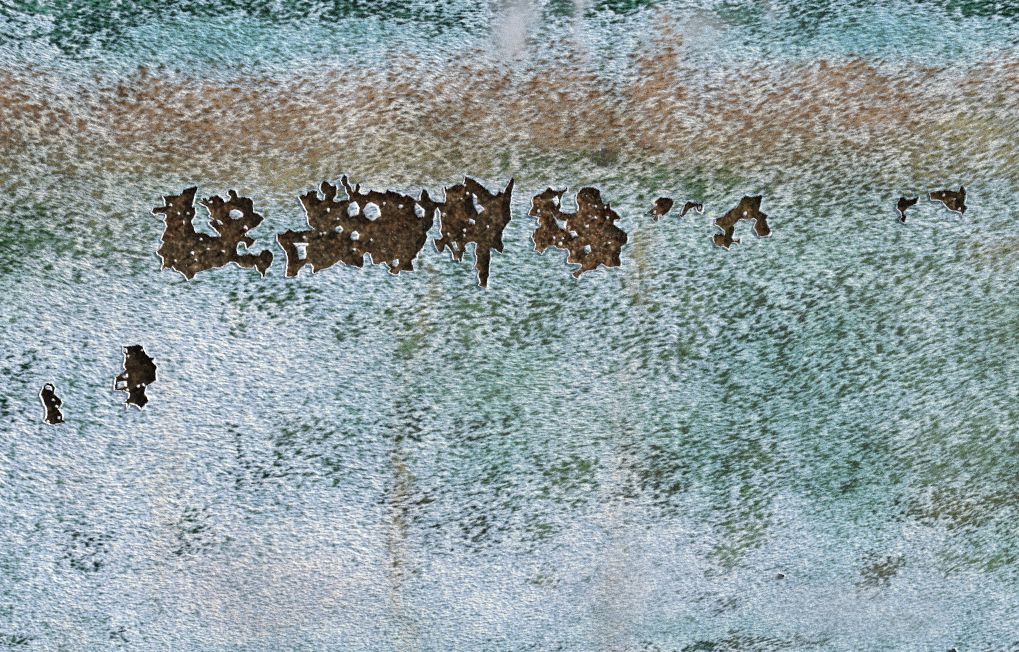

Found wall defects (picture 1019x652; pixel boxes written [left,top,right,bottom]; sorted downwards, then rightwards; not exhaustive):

rust [0,7,1019,200]
peeling [150,174,515,288]
peeling [528,186,628,280]
peeling [645,197,704,223]
peeling [712,195,772,251]
peeling [895,185,968,224]
peeling [39,383,66,426]
peeling [114,344,158,412]